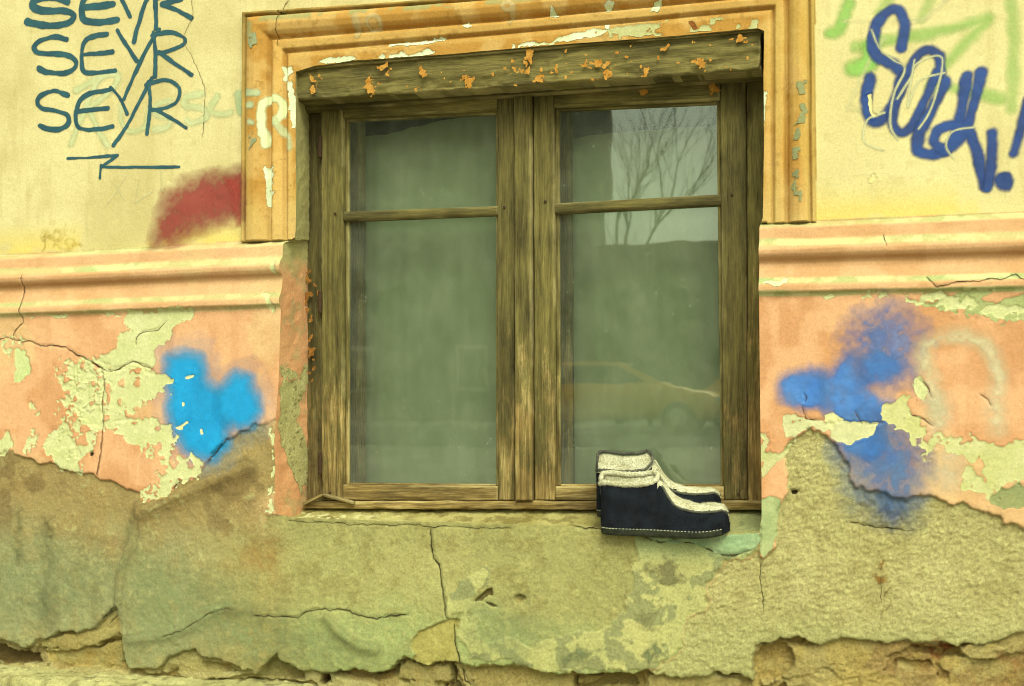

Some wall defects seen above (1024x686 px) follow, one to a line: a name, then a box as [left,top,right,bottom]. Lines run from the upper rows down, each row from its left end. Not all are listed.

peeling [282,66,296,128]
peeling [309,56,356,94]
peeling [363,37,447,97]
peeling [491,0,670,96]
peeling [905,288,1024,326]
crack [927,273,1024,287]
crack [0,275,164,477]
flaking render [0,269,319,680]
flaking render [471,376,1024,686]
crack [163,608,406,637]
crack [288,520,509,685]
flaking render [394,619,460,686]